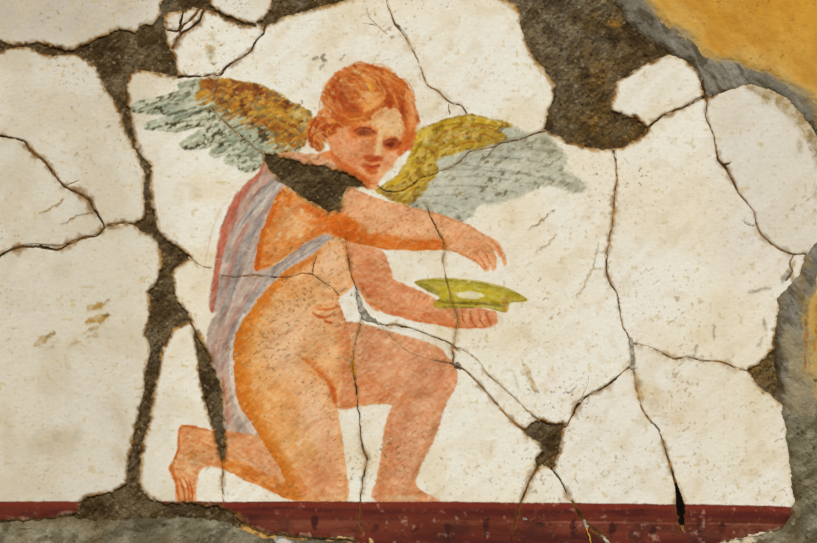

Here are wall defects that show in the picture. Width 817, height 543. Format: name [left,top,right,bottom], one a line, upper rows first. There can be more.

crack [167,3,270,155]
crack [361,0,469,116]
spalling [508,0,718,154]
crack [0,127,138,260]
crack [645,79,809,281]
spalling [0,0,372,543]
crack [186,127,549,538]
crack [563,148,751,537]
spalling [520,415,567,471]
crack [507,462,616,543]
spalling [720,531,773,543]